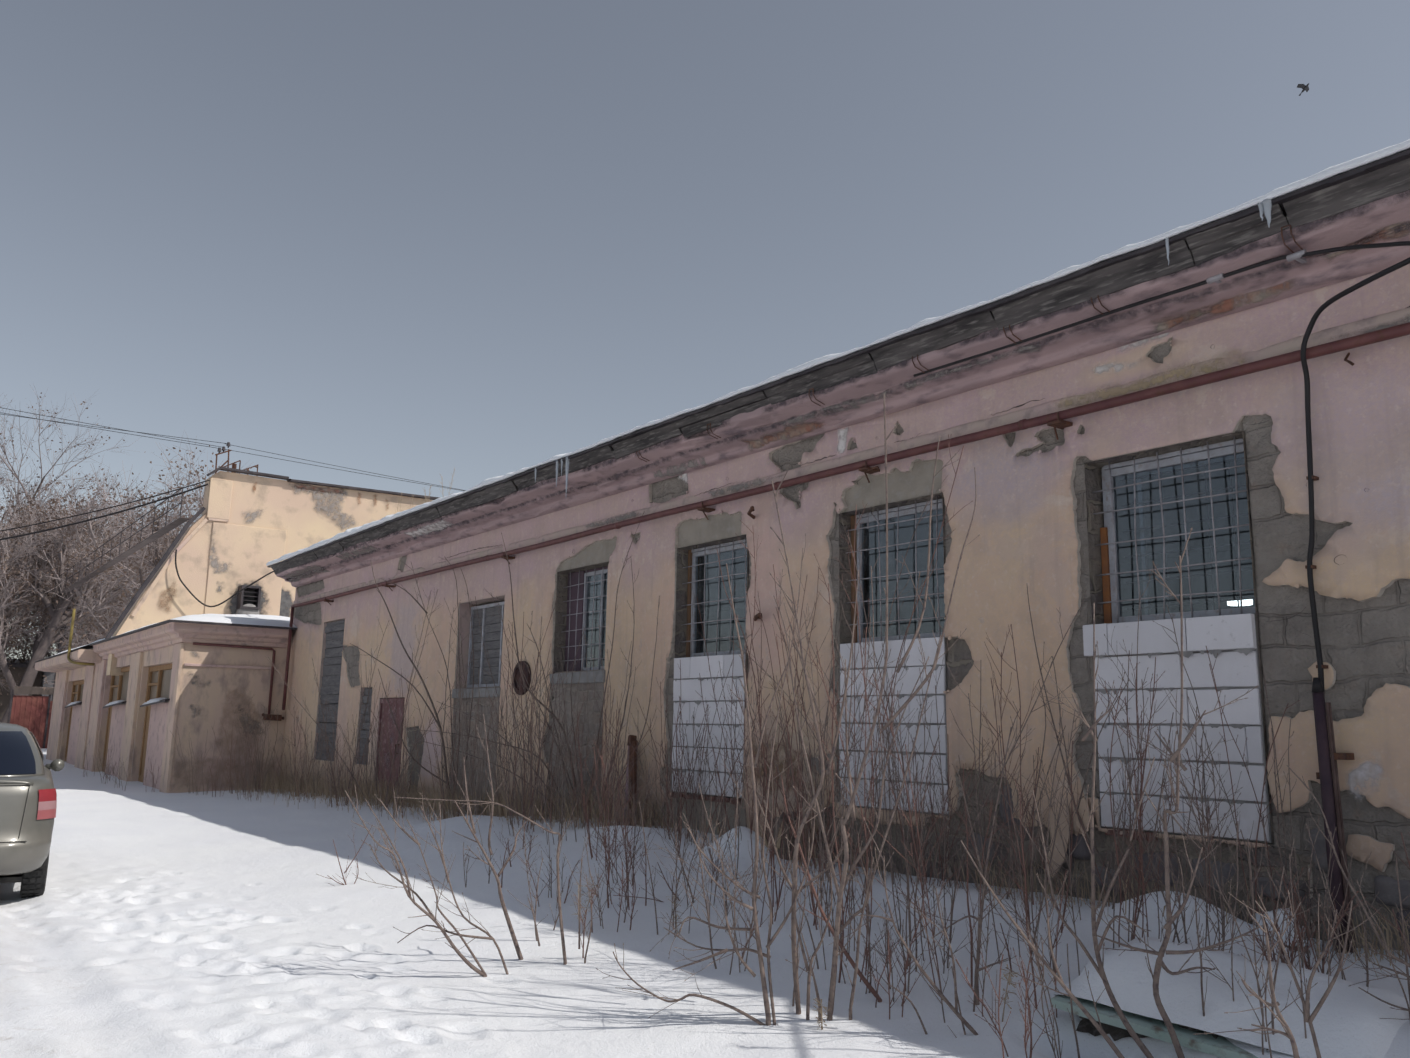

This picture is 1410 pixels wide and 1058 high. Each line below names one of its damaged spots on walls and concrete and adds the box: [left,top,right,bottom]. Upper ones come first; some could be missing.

spalling [1121,333,1172,364]
spalling [294,484,355,528]
spalling [652,473,688,503]
spalling [772,429,857,508]
spalling [1000,427,1085,457]
spalling [1235,414,1410,754]
spalling [812,457,1334,942]
spalling [1340,790,1410,950]